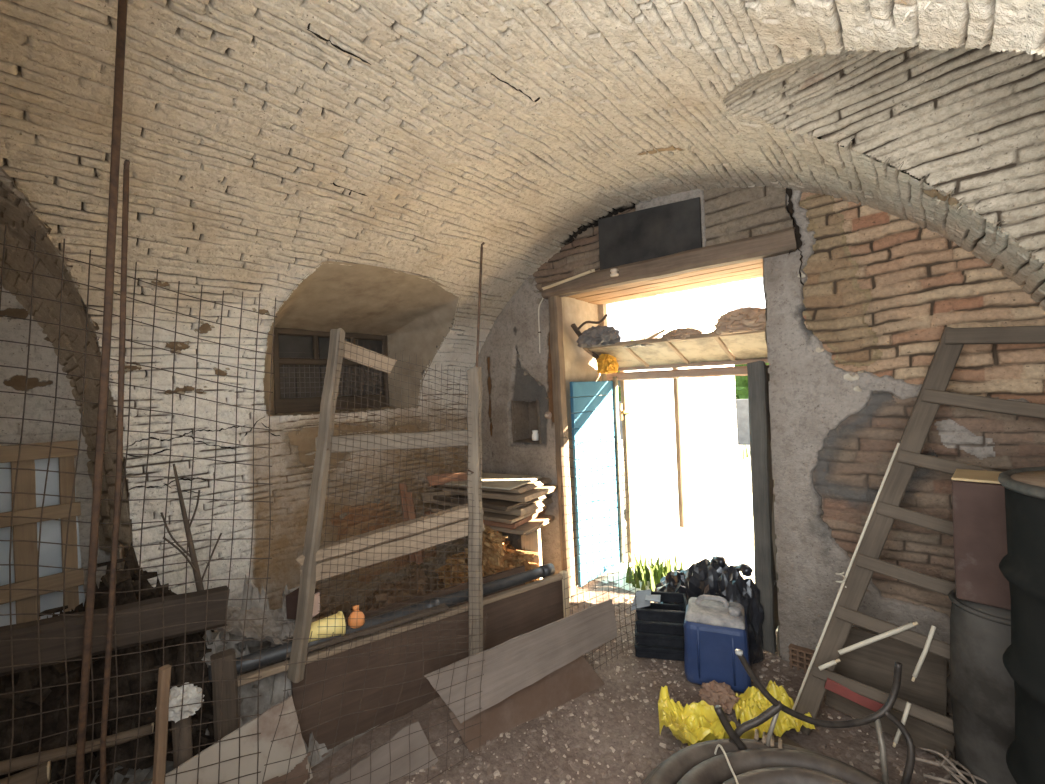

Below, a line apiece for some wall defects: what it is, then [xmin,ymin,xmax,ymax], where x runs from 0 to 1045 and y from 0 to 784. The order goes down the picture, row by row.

crack [786,188,804,285]